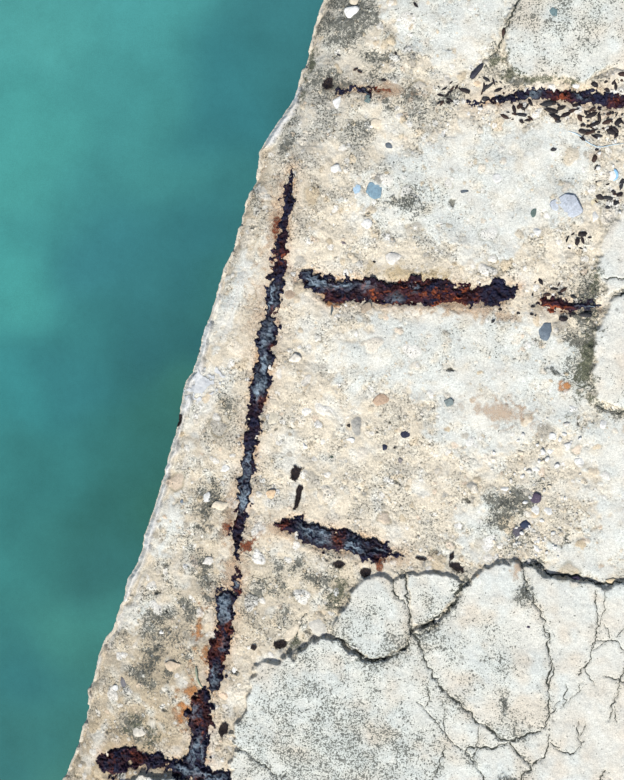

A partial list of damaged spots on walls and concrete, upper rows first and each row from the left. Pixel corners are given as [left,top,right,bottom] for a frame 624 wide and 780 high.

crack [488,0,520,59]
rust [466,86,624,110]
rust [298,269,519,314]
rust [538,295,601,314]
rust [95,168,296,780]
rust [272,514,404,571]
spalling [449,561,464,573]
spalling [410,604,451,634]
crack [342,563,624,780]